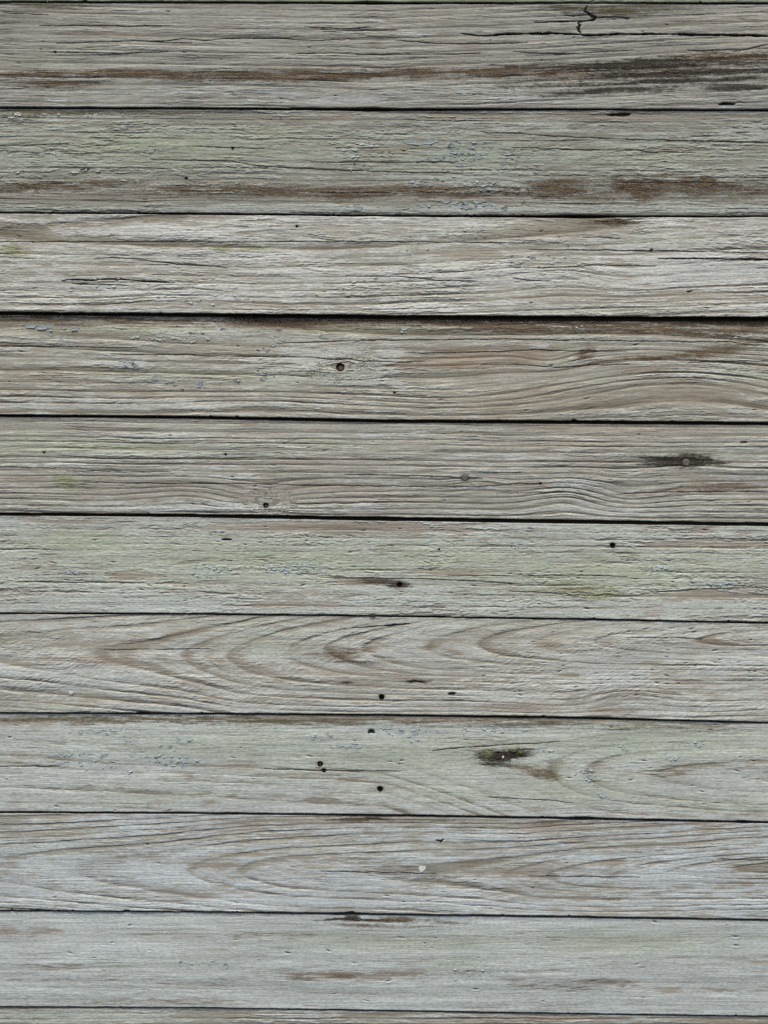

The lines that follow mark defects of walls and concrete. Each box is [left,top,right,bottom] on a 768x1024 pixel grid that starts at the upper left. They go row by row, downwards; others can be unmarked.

crack [11,7,768,56]
peeling [403,130,534,210]
peeling [22,323,79,339]